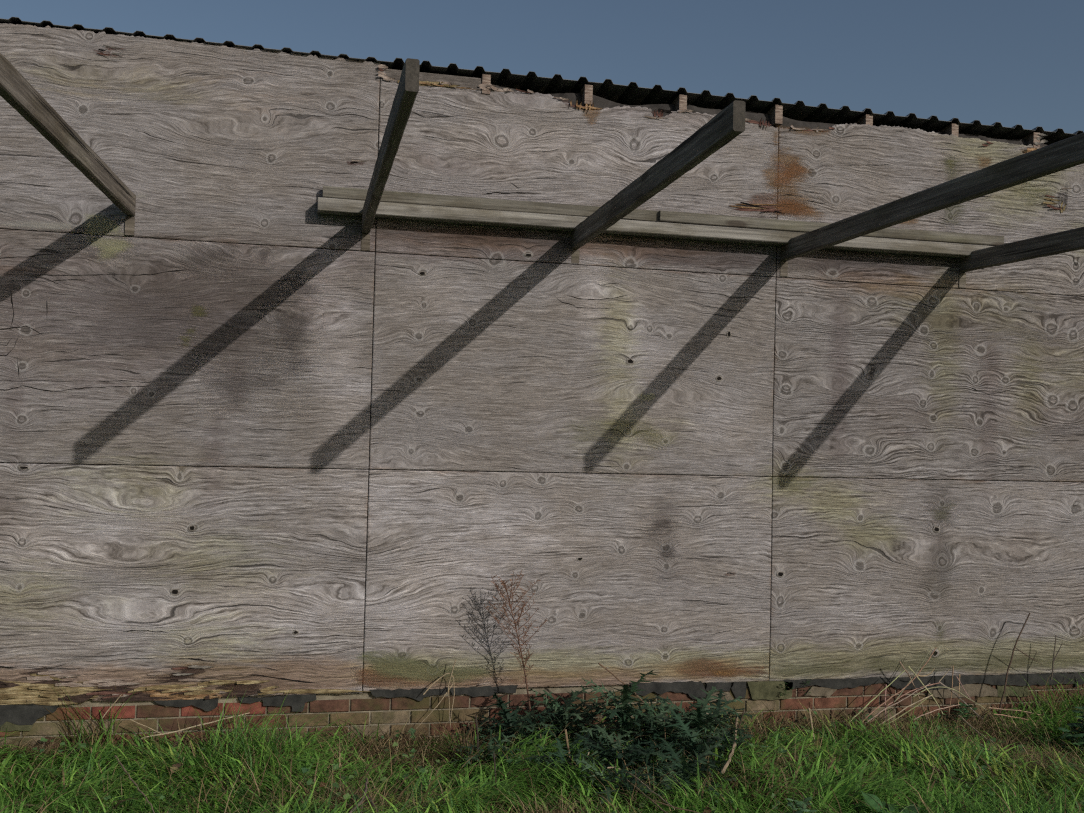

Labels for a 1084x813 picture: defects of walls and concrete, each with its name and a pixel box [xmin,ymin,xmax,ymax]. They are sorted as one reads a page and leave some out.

spalling [0,665,348,731]